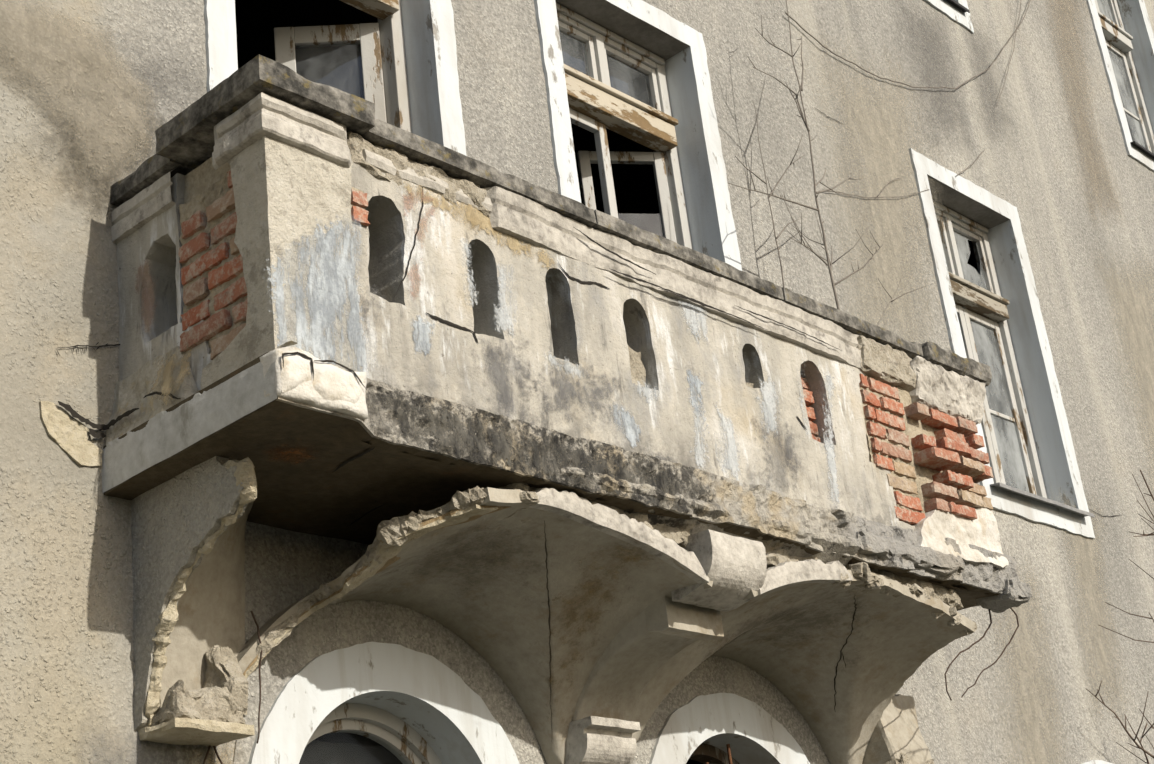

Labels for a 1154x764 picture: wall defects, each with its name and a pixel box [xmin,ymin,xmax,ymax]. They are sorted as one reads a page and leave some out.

flaking render [151,170,247,405]
crack [394,186,423,297]
crack [427,313,478,343]
flaking render [39,401,109,467]
peeling [610,405,641,448]
peeling [800,375,839,502]
flaking render [859,373,994,526]
spalling [134,457,257,727]
crack [544,520,552,729]
crack [834,596,857,710]